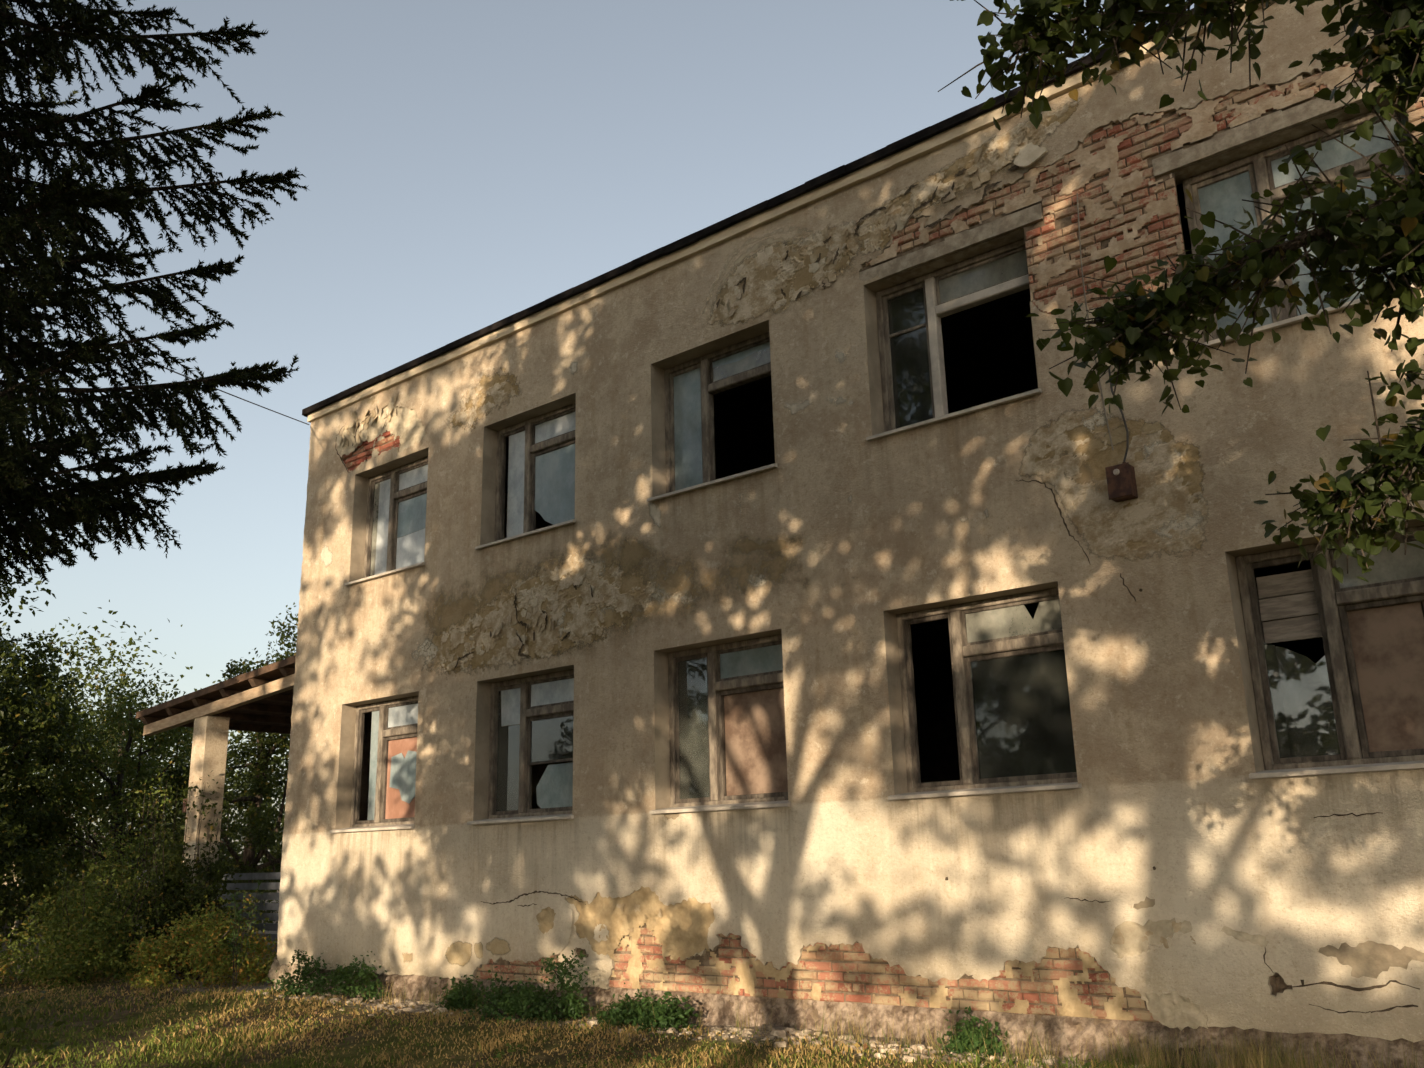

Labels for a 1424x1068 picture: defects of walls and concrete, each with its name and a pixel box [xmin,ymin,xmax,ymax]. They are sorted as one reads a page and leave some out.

flaking render [1406,97,1424,148]
flaking render [707,59,1374,327]
flaking render [337,395,425,473]
peeling [1015,408,1209,565]
peeling [424,551,660,675]
flaking render [445,886,1208,1030]
crack [1263,948,1420,1013]
flaking render [1318,940,1424,979]